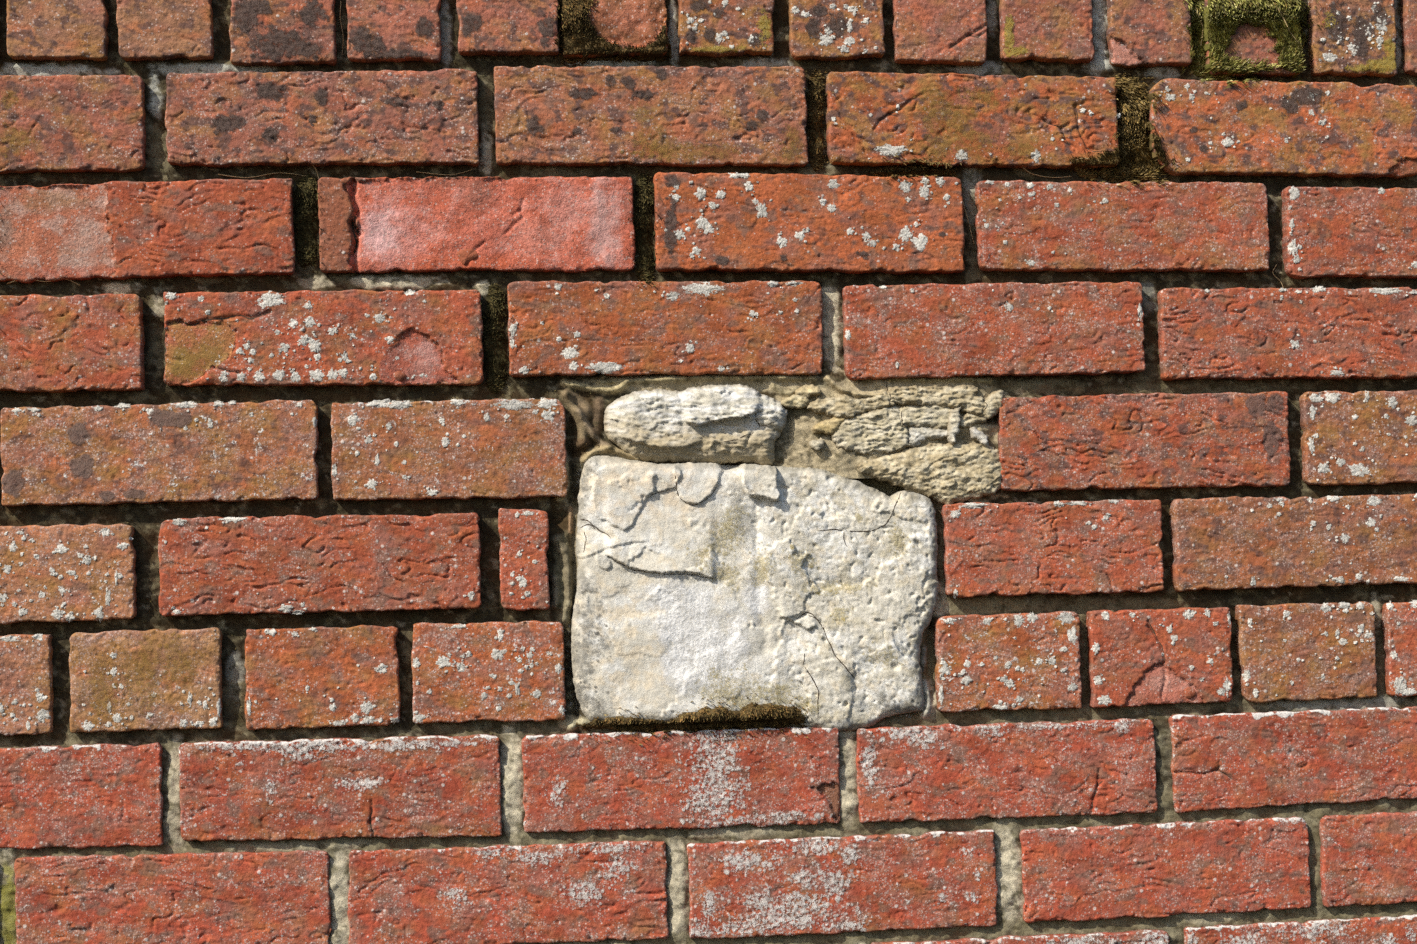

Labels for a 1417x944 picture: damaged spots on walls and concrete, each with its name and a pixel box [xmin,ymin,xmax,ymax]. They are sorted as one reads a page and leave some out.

water stain [1279,84,1325,116]
crack [652,475,717,506]
crack [817,495,900,546]
crack [581,519,712,579]
crack [796,612,855,719]
crack [1144,623,1165,673]